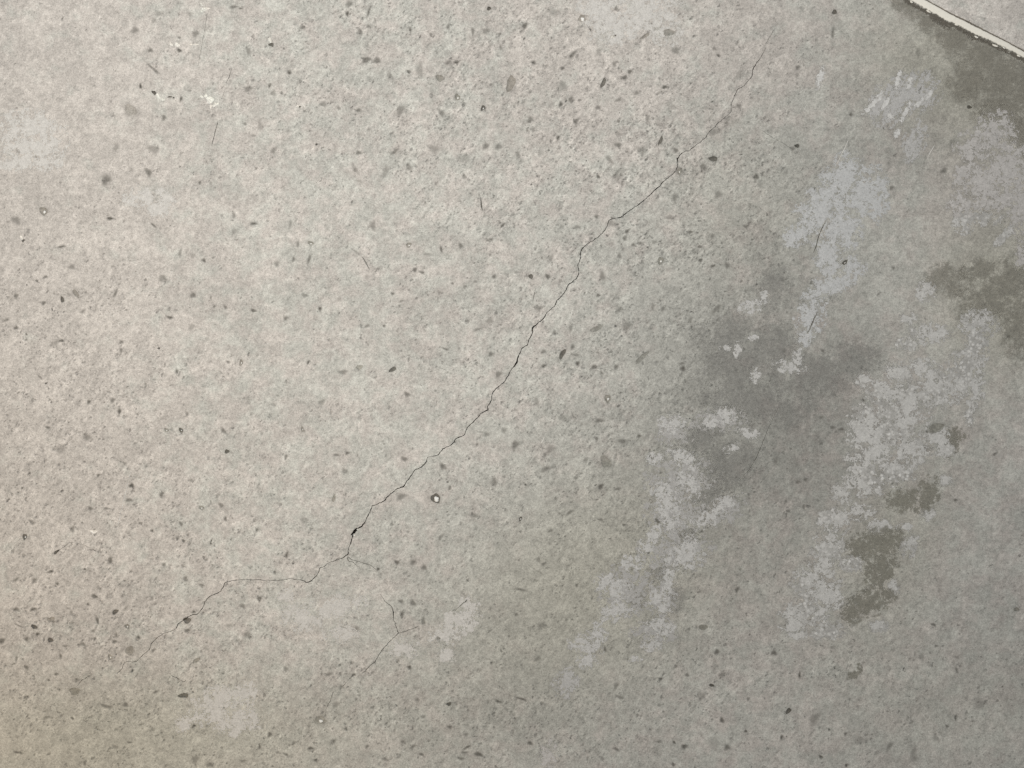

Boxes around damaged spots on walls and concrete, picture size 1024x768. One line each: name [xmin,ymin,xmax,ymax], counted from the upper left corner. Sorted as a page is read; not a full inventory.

crack [327,597,418,707]
crack [120,30,774,671]
water stain [550,405,761,700]
water stain [719,334,759,359]
water stain [737,290,769,315]
water stain [749,149,891,384]
water stain [776,281,1002,641]
water stain [860,0,1024,270]